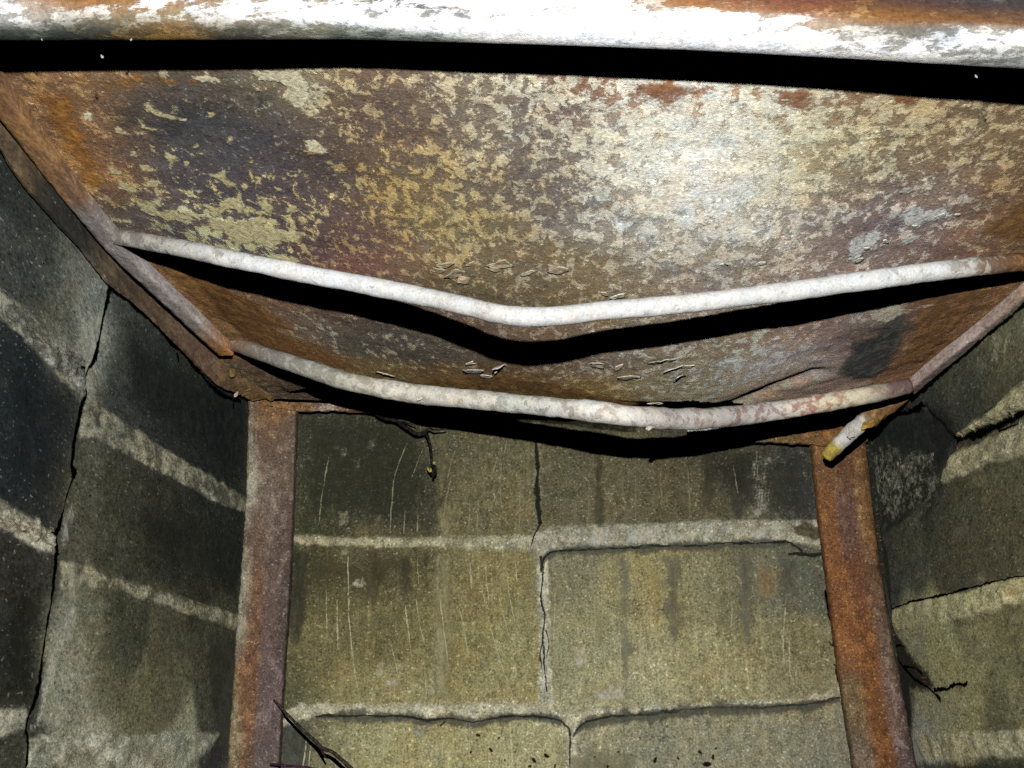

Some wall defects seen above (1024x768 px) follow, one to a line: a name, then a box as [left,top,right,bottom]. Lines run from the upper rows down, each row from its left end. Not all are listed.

corrosion [35,92,101,188]
corrosion [632,82,701,107]
corrosion [774,89,812,108]
corrosion [161,266,357,370]
corrosion [906,288,992,362]
corrosion [418,374,637,406]
crack [24,267,241,768]
crack [316,429,840,766]